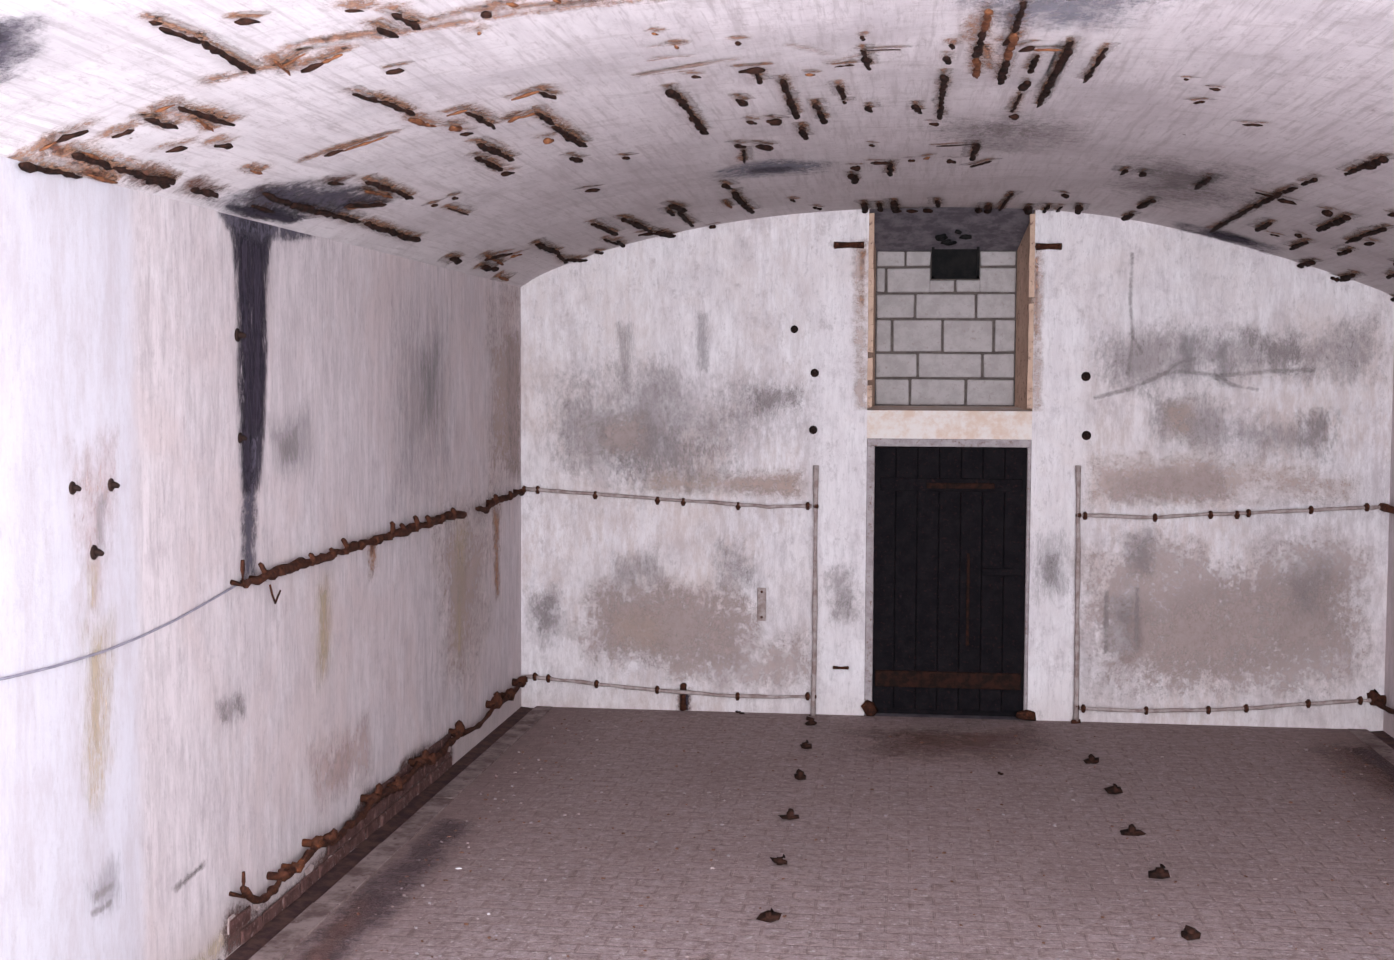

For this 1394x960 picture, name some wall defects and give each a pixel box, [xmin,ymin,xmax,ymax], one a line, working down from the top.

spalling [8,97,244,200]
spalling [240,163,471,242]
spalling [141,0,658,83]
spalling [300,61,590,177]
spalling [636,28,710,135]
spalling [728,31,911,164]
spalling [847,140,999,214]
spalling [911,0,1120,127]
spalling [1206,174,1394,282]
damp [220,213,311,579]
damp [577,579,807,685]
damp [1087,534,1367,694]